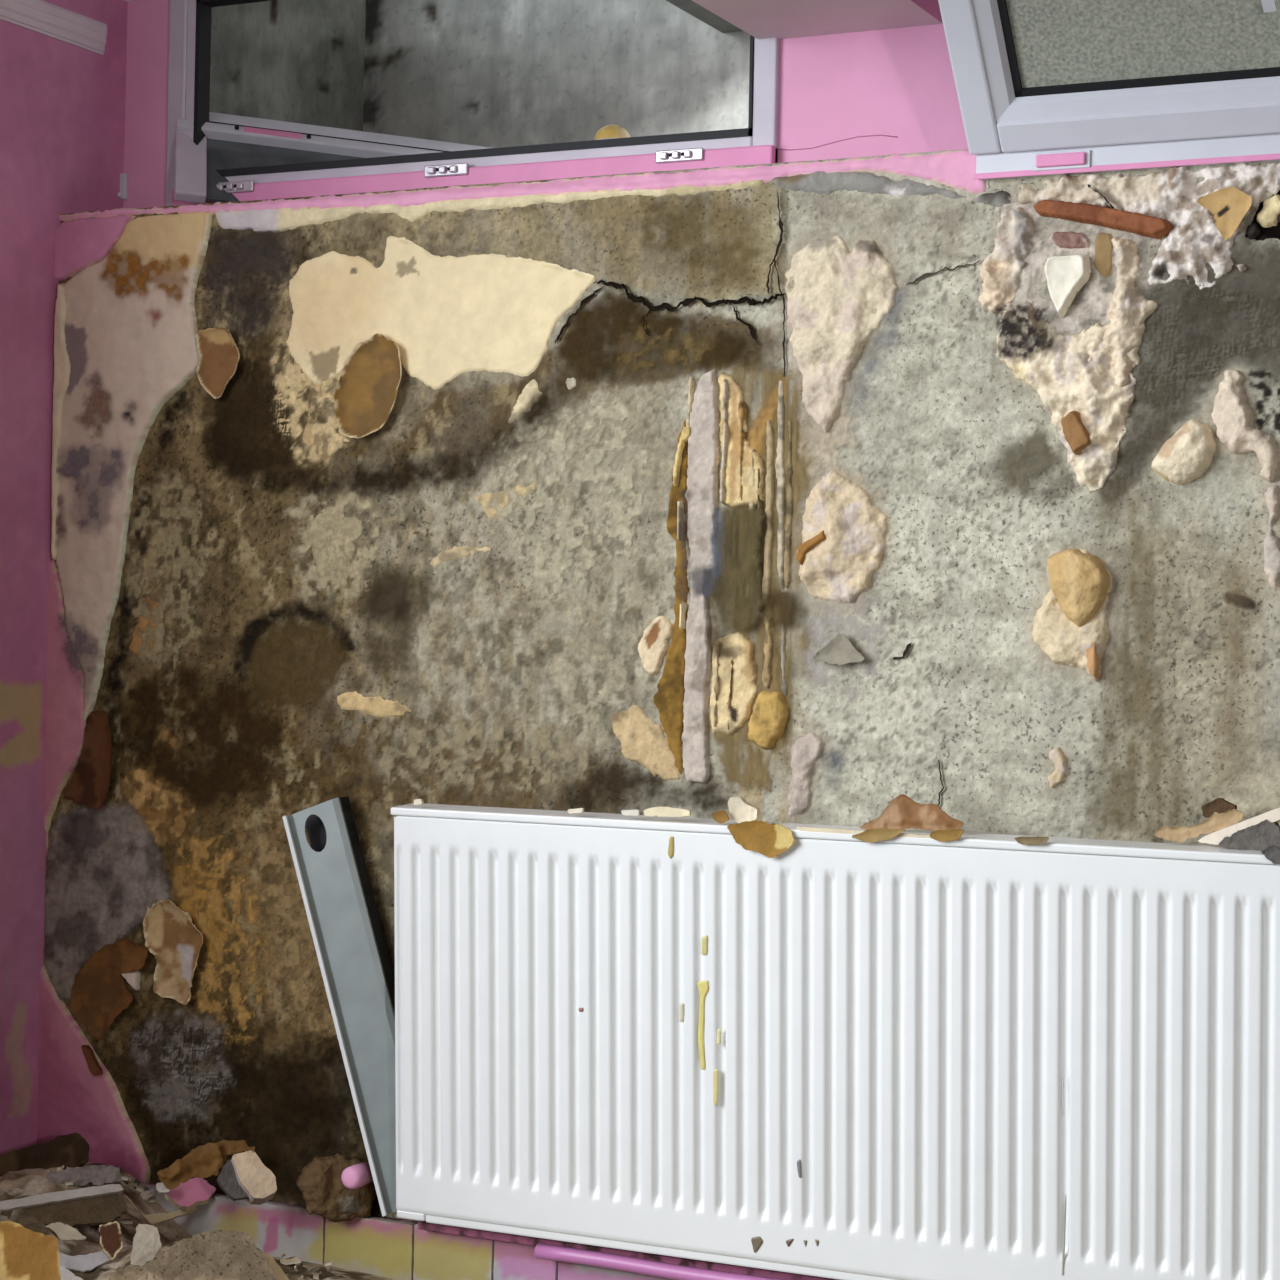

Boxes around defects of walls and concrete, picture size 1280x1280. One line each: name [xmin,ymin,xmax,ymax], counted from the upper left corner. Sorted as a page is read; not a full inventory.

damp [207,360,475,496]
damp [522,394,550,424]
damp [559,293,693,381]
peeling [51,162,1280,721]
crack [555,192,786,377]
damp [1101,255,1280,500]
damp [106,569,434,806]
damp [566,764,664,811]
spalling [712,732,825,858]
peeling [852,828,905,842]
flaking render [44,805,231,1121]
peeling [156,1140,255,1194]